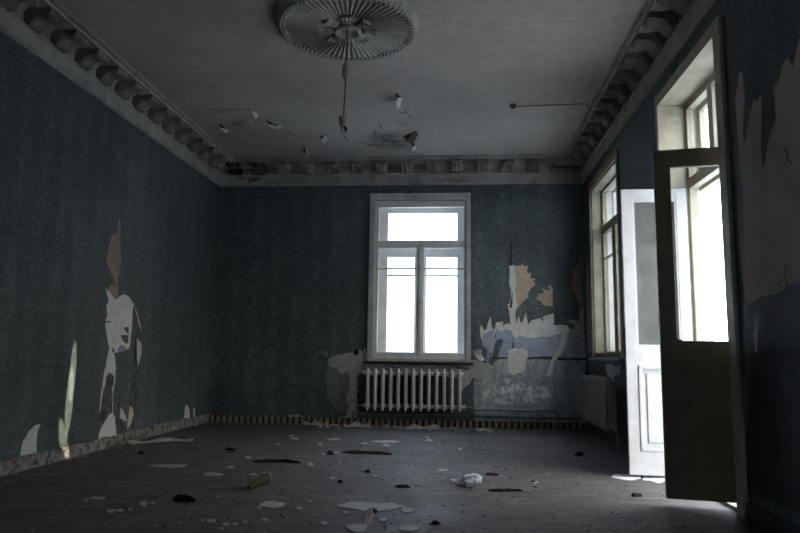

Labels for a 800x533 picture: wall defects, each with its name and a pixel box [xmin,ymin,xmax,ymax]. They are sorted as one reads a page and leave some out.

peeling [403,131,418,151]
flaking render [735,38,800,305]
flaking render [100,289,133,410]
flaking render [319,349,375,418]
peeling [473,309,592,423]
flaking render [20,424,41,456]
flaking render [98,403,117,439]